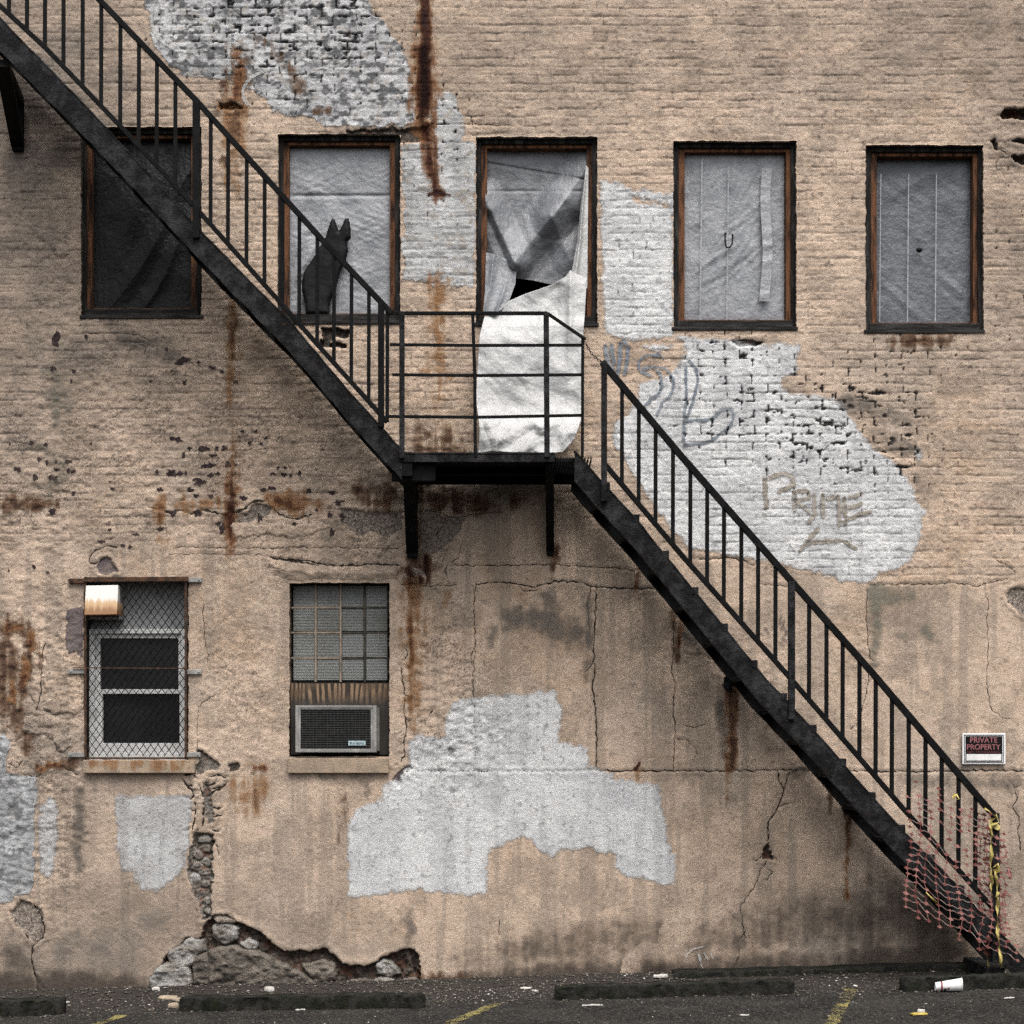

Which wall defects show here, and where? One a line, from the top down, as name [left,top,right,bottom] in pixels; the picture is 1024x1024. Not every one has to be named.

peeling [143,0,420,142]
corrosion [408,0,451,204]
corrosion [154,444,241,555]
peeling [0,734,45,943]
corrosion [0,614,118,773]
flaking render [187,750,240,920]
corrosion [398,526,437,711]
crack [170,546,799,960]
corrosion [724,686,738,773]
crack [850,768,1023,851]
crack [25,905,45,981]